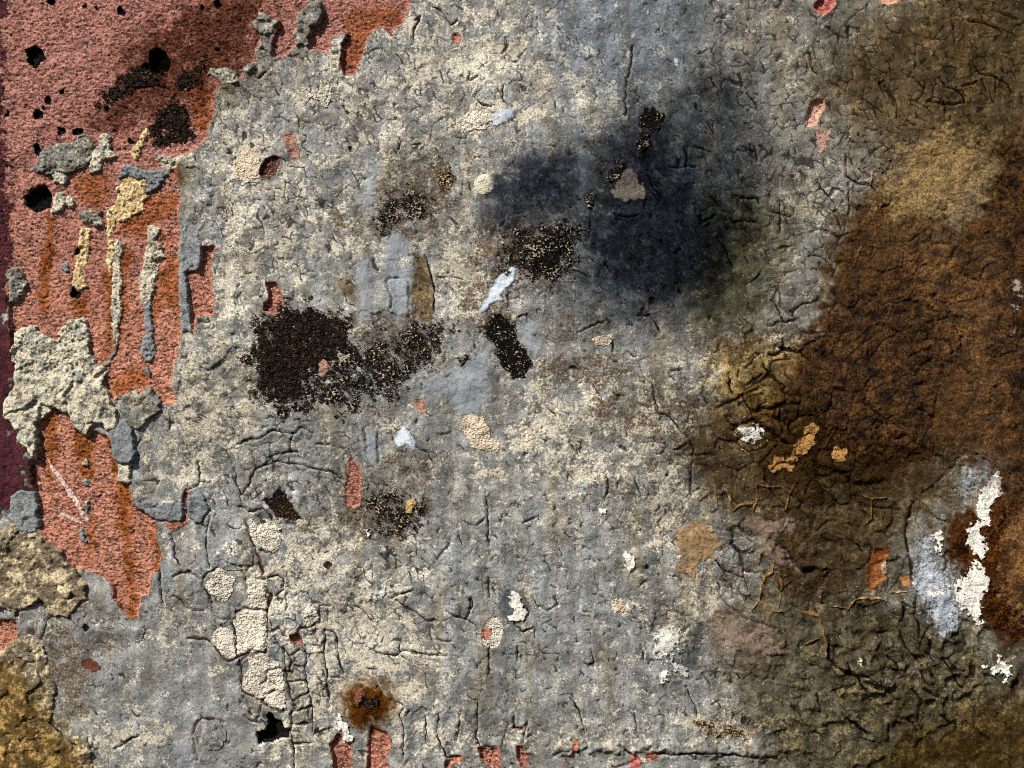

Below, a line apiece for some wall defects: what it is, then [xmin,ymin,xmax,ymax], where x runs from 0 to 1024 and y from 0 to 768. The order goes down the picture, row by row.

spalling [0,0,412,405]
crack [717,302,829,445]
corrosion [767,112,1024,651]
spalling [7,408,211,618]
spalling [221,539,241,558]
crack [158,427,344,768]
spalling [248,518,295,564]
spalling [344,456,363,510]
corrosion [343,681,395,728]
crack [371,644,447,661]
crack [658,751,773,759]
crack [827,506,989,743]